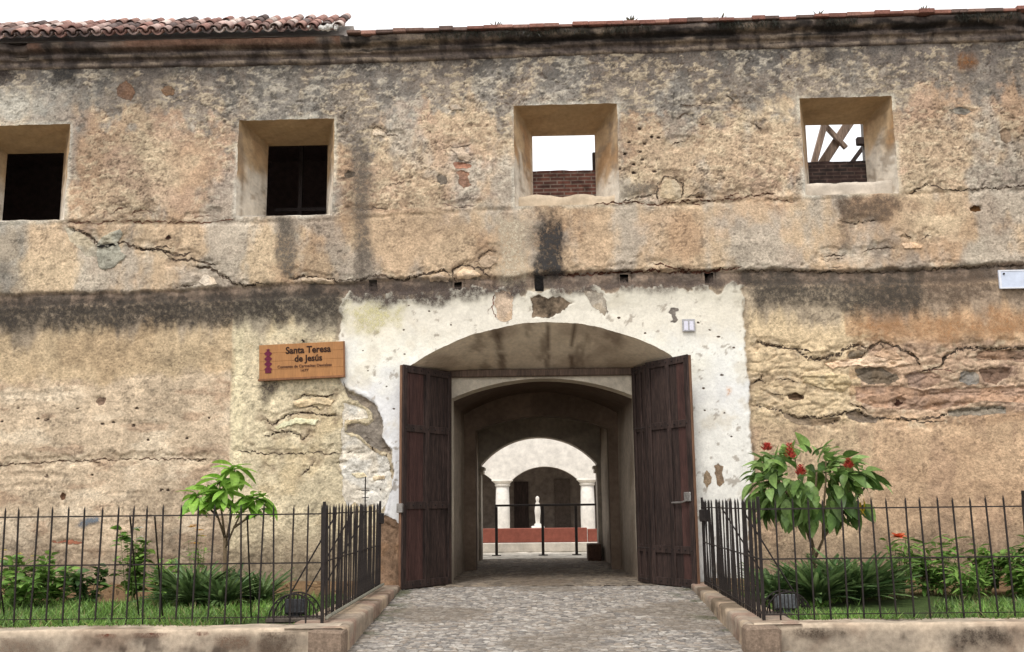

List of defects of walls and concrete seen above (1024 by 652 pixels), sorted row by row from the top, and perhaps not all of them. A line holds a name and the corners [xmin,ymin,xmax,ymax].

crack [594,175,795,206]
crack [911,183,1024,194]
crack [67,207,264,288]
water stain [0,150,991,332]
spalling [494,290,513,322]
spalling [530,295,571,318]
spalling [584,289,620,319]
crack [752,340,1024,424]
spalling [783,349,1024,426]
spalling [339,382,401,590]